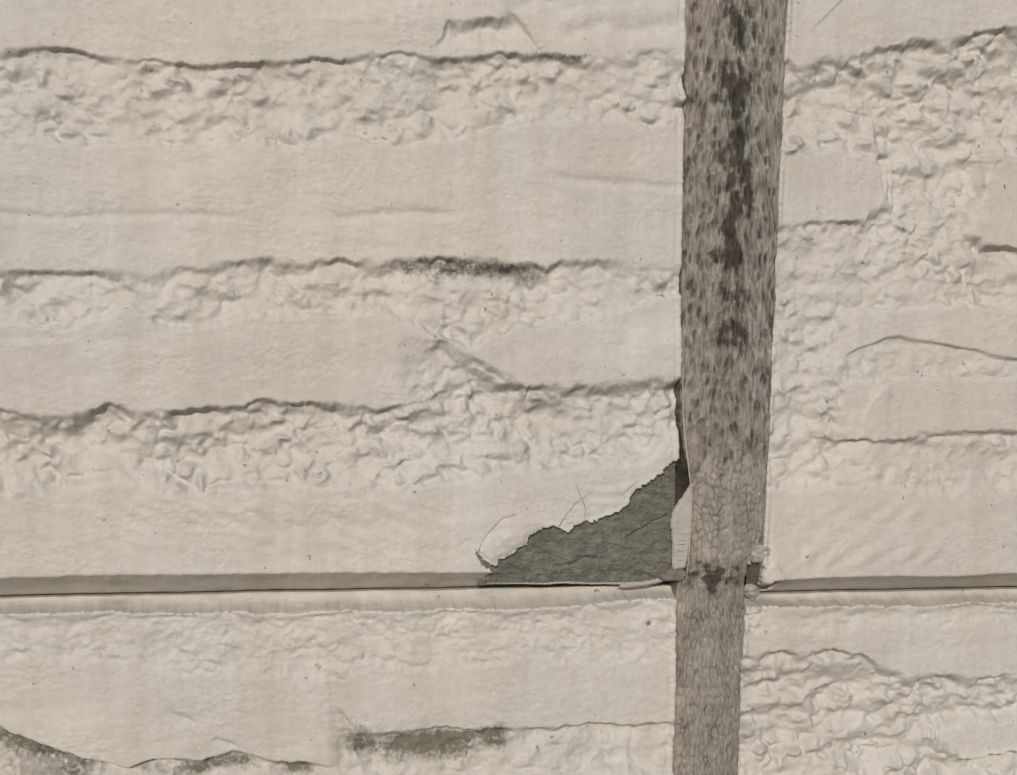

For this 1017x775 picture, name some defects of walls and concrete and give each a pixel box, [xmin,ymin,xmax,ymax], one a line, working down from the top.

spalling [476,461,693,592]